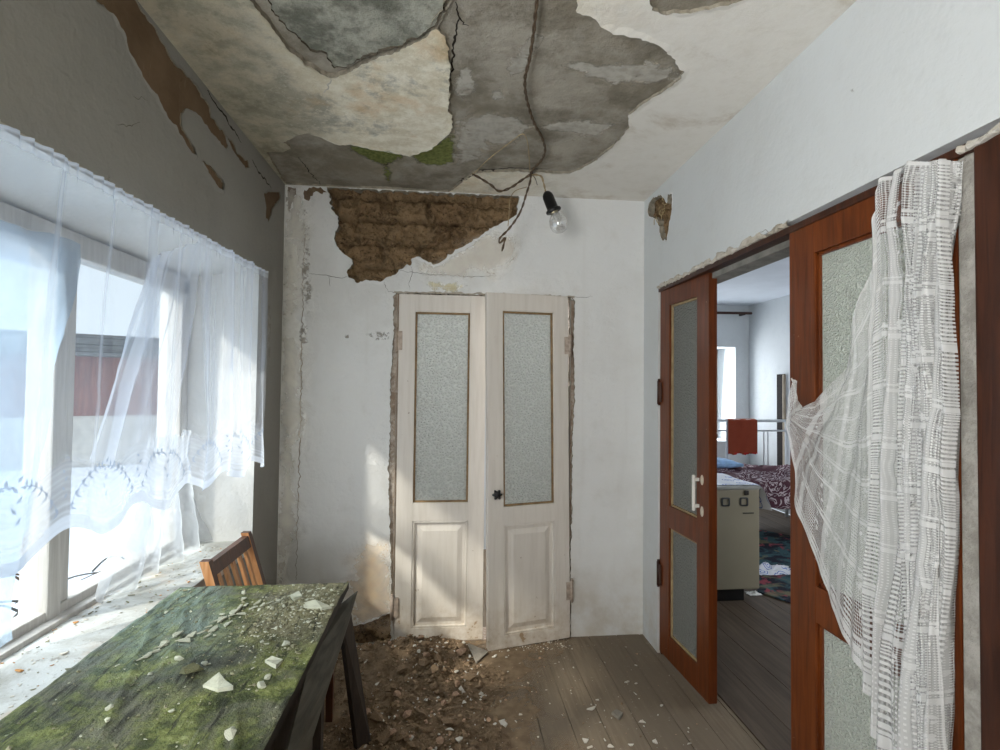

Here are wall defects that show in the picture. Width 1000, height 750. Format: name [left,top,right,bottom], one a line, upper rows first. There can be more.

peeling [96,0,250,194]
crack [450,2,469,81]
crack [295,235,345,579]
flaking render [245,0,689,594]